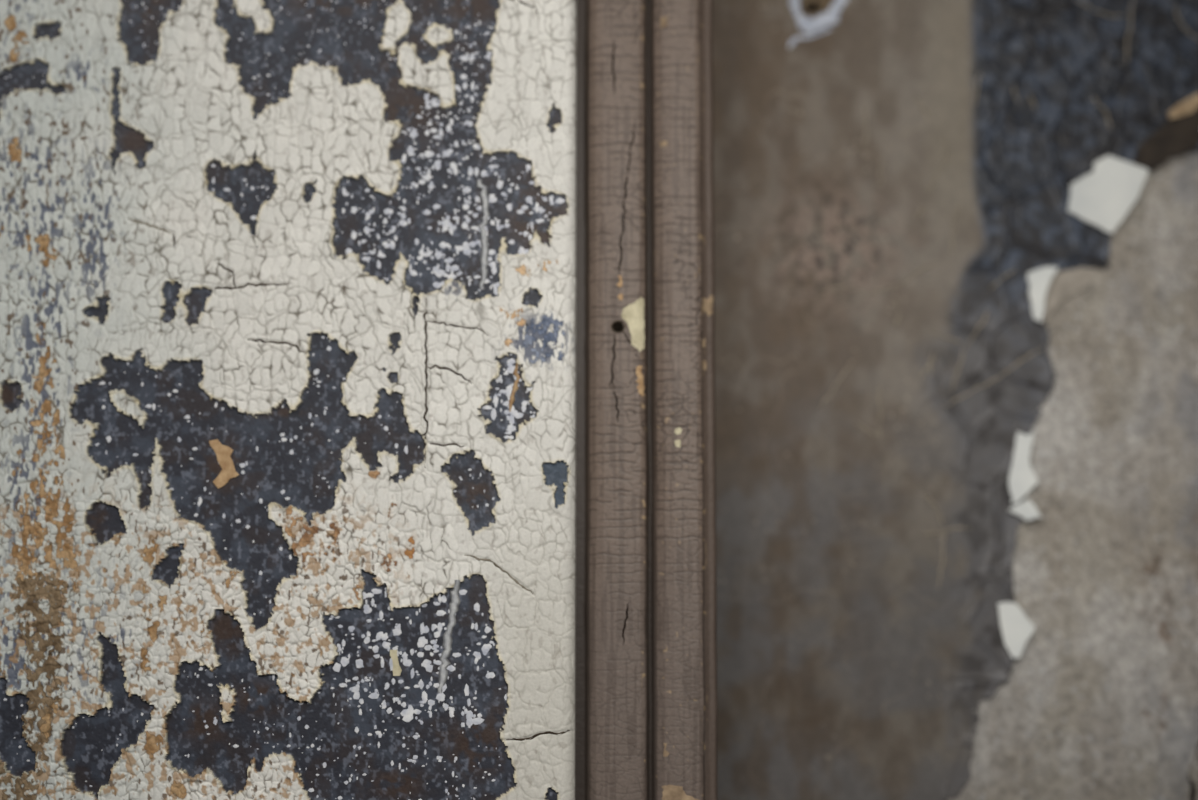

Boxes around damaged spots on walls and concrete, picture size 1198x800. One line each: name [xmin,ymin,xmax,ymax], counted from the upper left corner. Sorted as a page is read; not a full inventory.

peeling [108,0,183,176]
peeling [204,0,569,319]
crack [203,264,290,290]
crack [423,297,488,465]
spalling [929,0,1198,800]
corrosion [0,323,80,800]
corrosion [138,534,167,672]
peeling [60,331,517,800]
crack [465,555,534,595]
corrosion [142,731,165,759]
corrosion [171,781,187,798]
crack [505,730,569,741]